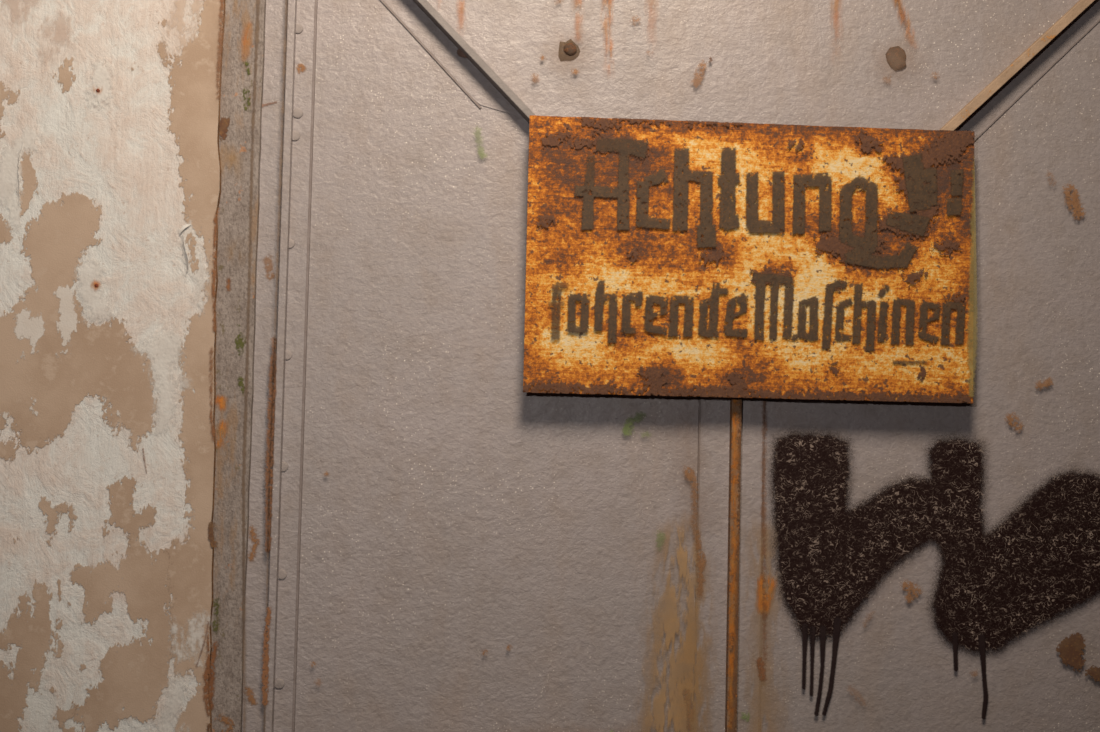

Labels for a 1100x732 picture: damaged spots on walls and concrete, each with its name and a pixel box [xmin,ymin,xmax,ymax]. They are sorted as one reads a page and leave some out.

corrosion [692,57,712,87]
peeling [0,0,224,732]
corrosion [209,0,305,732]
corrosion [643,467,706,732]
corrosion [728,398,742,732]
corrosion [757,502,774,681]
peeling [1056,632,1100,682]